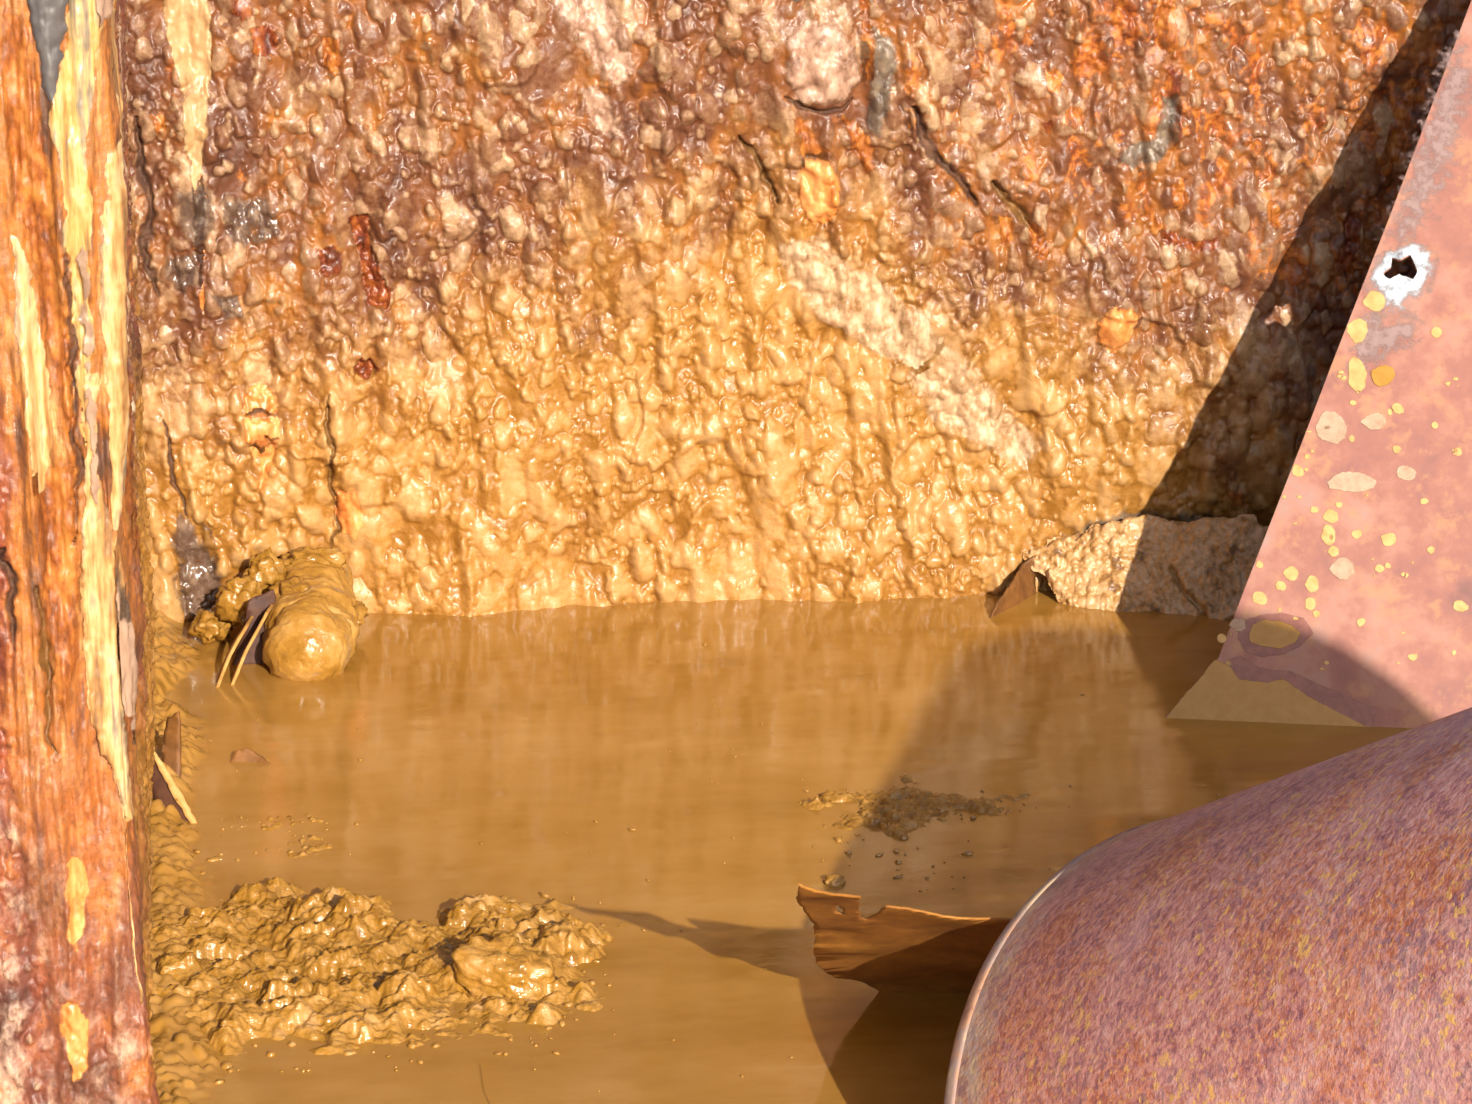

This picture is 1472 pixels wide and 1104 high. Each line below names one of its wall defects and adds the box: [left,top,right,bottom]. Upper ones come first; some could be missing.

spalling [27,0,69,102]
corrosion [232,0,278,57]
corrosion [1152,0,1183,146]
corrosion [0,7,76,433]
corrosion [794,118,830,159]
crack [912,106,1029,227]
corrosion [1135,170,1219,253]
corrosion [122,357,141,561]
crack [0,547,57,754]
corrosion [32,460,80,726]
corrosion [65,857,90,951]
corrosion [59,1002,89,1082]